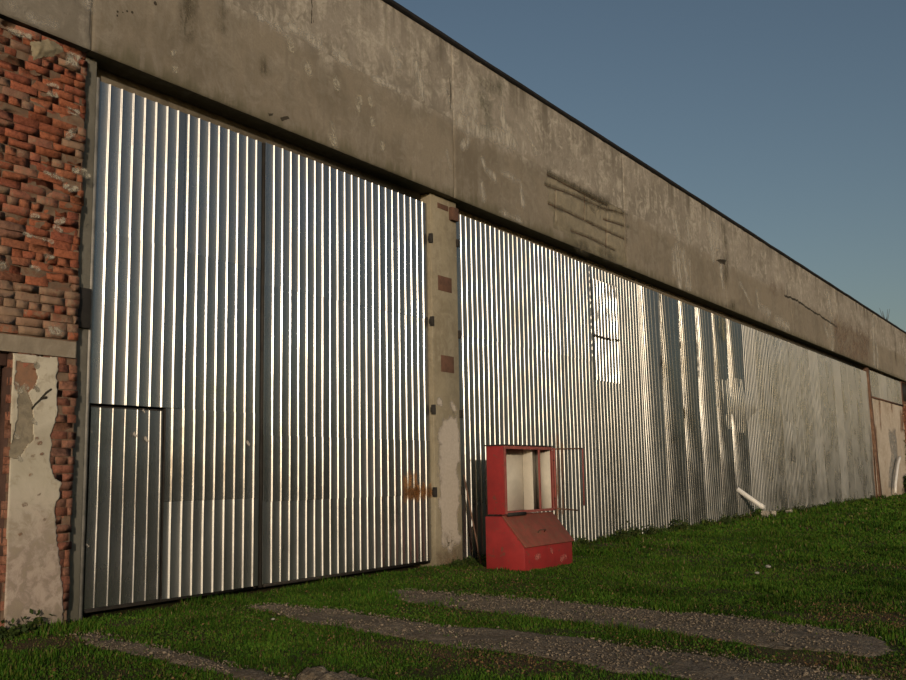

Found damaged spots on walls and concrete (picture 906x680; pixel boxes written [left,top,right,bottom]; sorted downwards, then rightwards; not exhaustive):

spalling [545,172,628,266]
crack [784,295,837,329]
peeling [9,361,44,462]
corrosion [404,475,432,500]